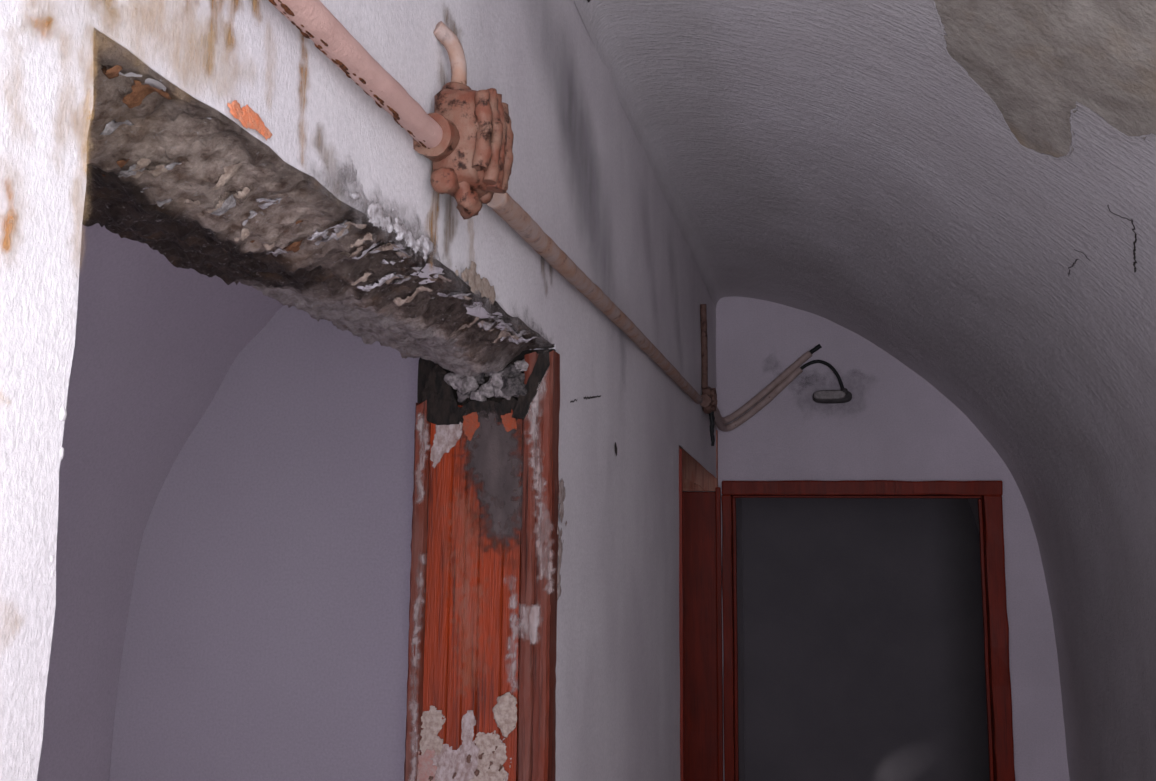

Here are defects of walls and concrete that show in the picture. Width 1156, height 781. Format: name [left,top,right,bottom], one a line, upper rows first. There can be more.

spalling [99,80,173,135]
peeling [932,0,1156,159]
spalling [102,158,182,193]
spalling [157,163,547,345]
spalling [430,359,529,468]
peeling [421,734,512,781]